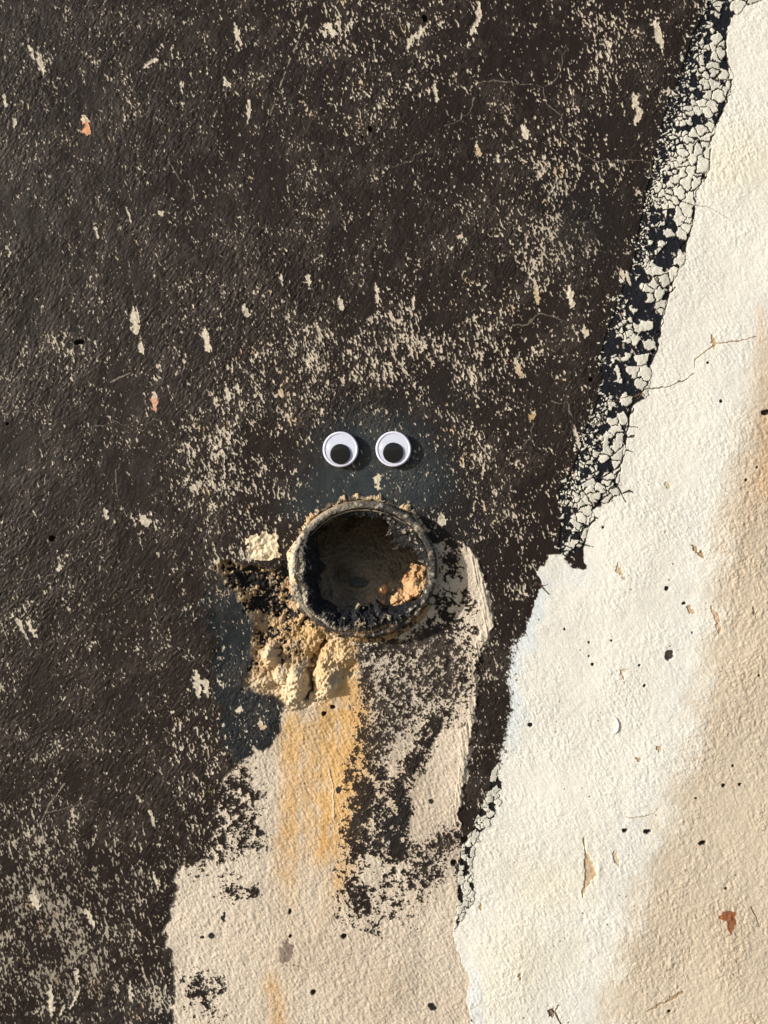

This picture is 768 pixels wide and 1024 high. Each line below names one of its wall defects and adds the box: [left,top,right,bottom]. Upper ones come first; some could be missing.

peeling [467,1,482,36]
peeling [568,0,664,61]
peeling [631,92,643,126]
peeling [515,120,620,308]
crack [393,0,761,558]
peeling [711,606,722,636]
peeling [164,464,529,1024]
rust [267,674,379,919]
peeling [581,837,598,899]